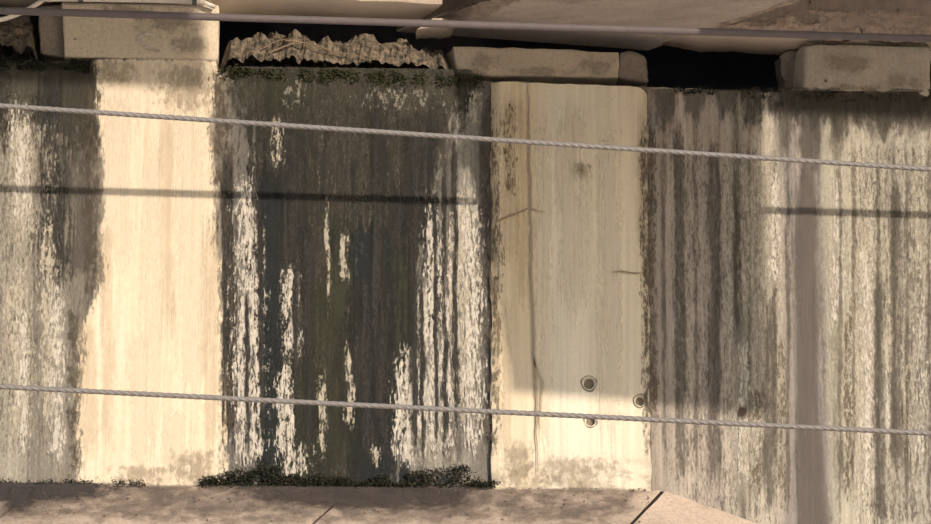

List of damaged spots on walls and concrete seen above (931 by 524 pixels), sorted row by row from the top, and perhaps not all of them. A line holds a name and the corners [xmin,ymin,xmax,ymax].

spalling [416,18,455,39]
leakage [0,19,518,486]
leakage [638,111,660,455]
leakage [674,124,689,470]
leakage [707,117,931,524]